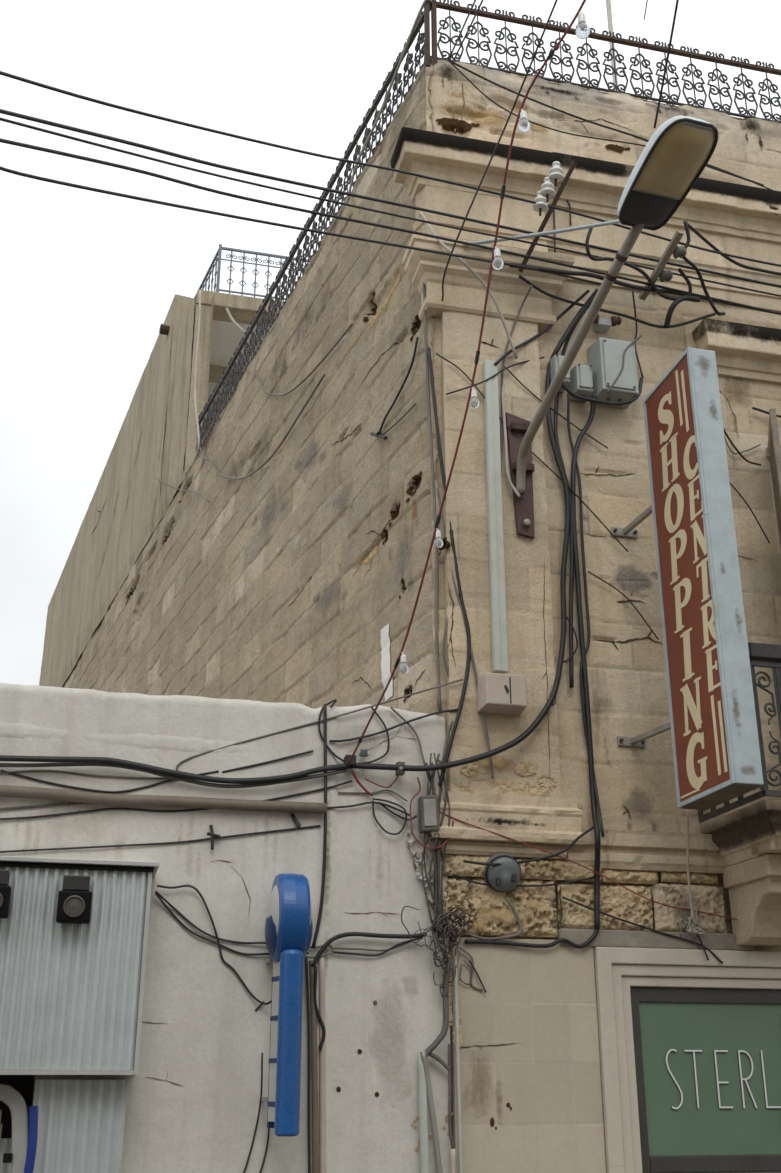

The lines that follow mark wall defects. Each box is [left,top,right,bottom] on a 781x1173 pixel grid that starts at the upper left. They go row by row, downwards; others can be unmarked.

spalling [435,92,547,135]
spalling [349,254,405,351]
spalling [358,471,422,567]